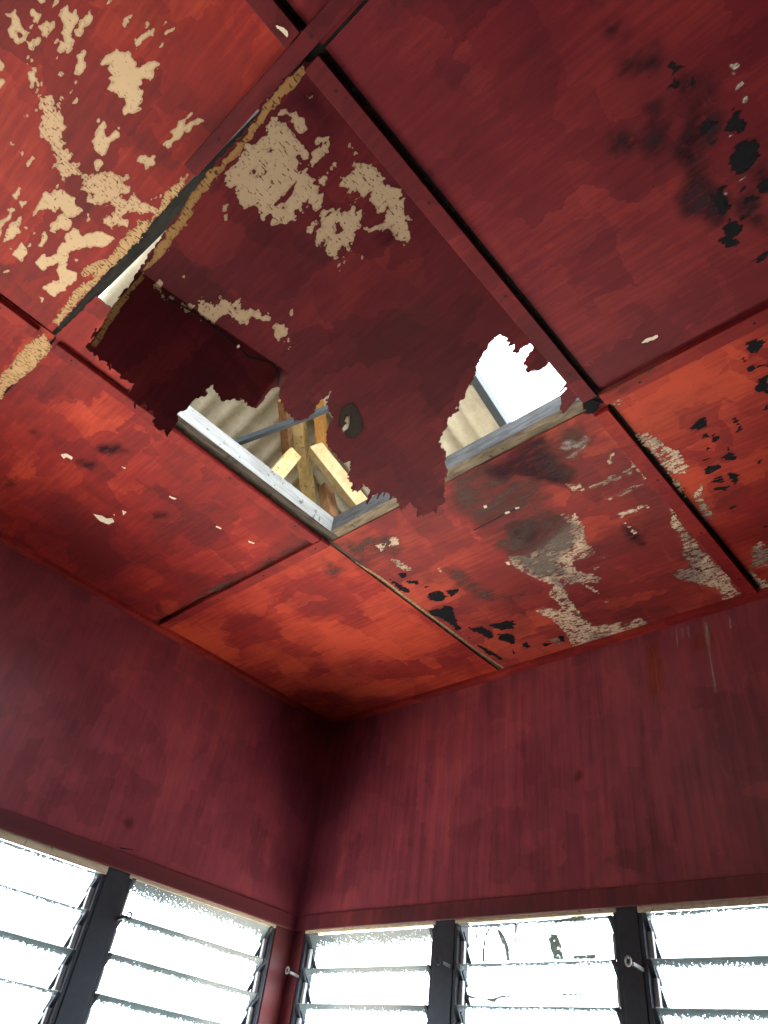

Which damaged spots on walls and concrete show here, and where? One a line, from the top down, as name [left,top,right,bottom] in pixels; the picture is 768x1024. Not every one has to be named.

peeling [100,21,175,115]
damp [625,55,696,89]
peeling [0,0,162,303]
peeling [137,112,204,170]
peeling [222,95,412,271]
damp [675,108,768,248]
peeling [153,279,293,350]
damp [739,339,768,410]
damp [690,417,740,491]
damp [389,571,530,660]
peeling [506,513,648,647]
peeling [669,509,741,600]